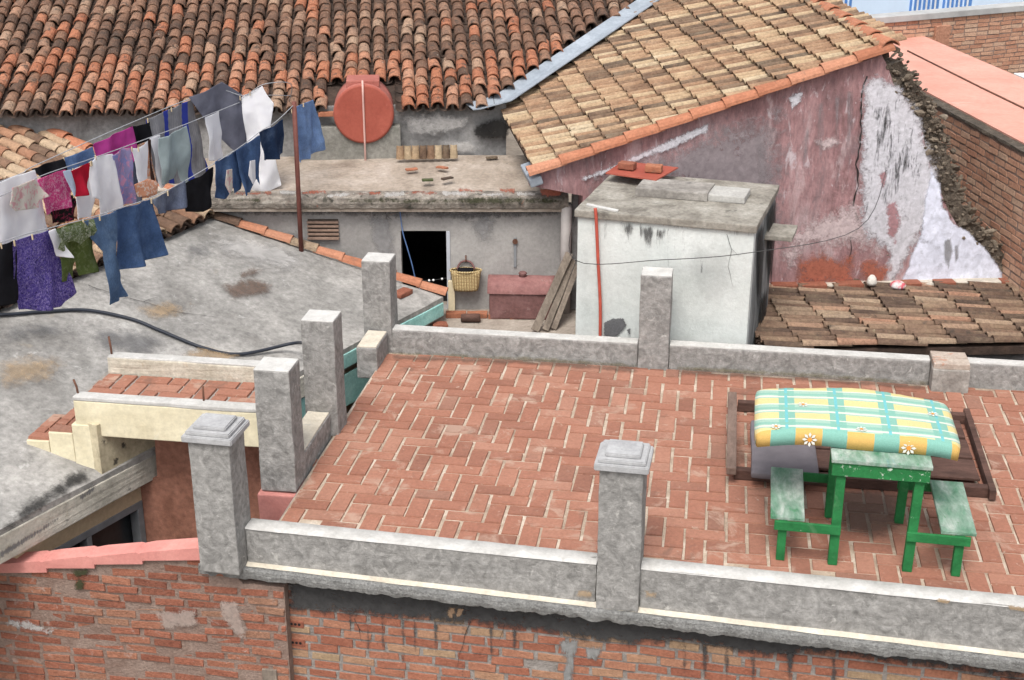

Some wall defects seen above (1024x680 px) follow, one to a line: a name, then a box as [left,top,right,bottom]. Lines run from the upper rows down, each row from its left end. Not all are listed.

peeling [628,125,708,162]
crack [849,76,868,257]
peeling [783,78,1002,283]
leakage [625,224,664,242]
leakage [289,584,1023,680]